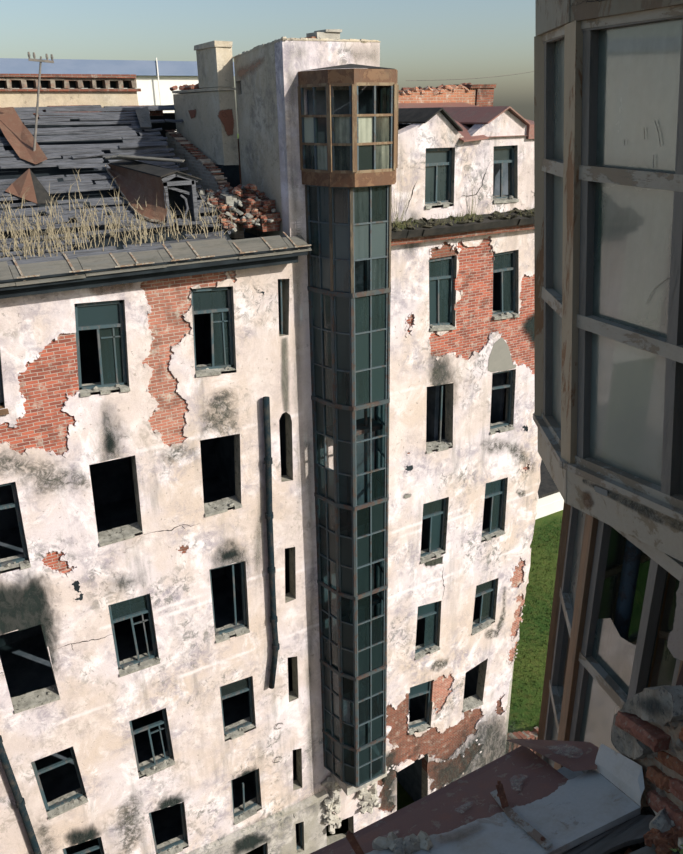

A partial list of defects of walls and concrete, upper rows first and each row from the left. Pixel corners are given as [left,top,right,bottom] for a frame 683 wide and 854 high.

spalling [218,109,234,136]
spalling [0,333,79,458]
spalling [140,271,236,447]
water stain [205,391,235,430]
spalling [428,236,534,374]
spalling [40,548,85,602]
spalling [486,556,529,665]
spalling [377,693,483,814]
spalling [426,660,456,714]
spalling [495,692,510,717]